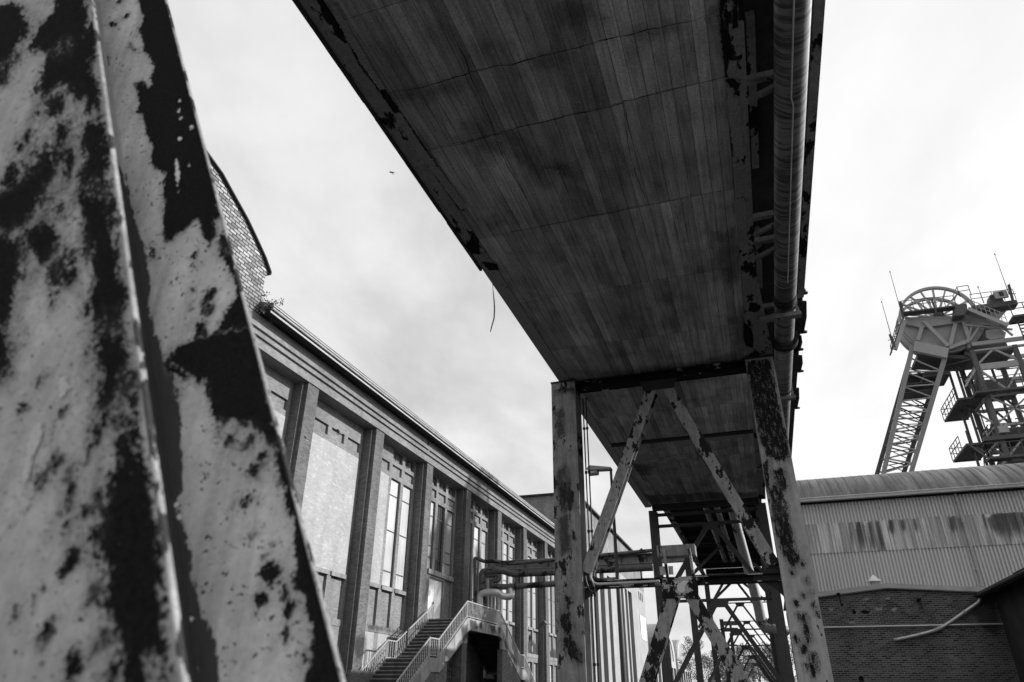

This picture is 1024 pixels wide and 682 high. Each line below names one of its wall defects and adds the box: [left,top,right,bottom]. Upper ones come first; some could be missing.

peeling [117,159,220,682]
peeling [22,423,43,484]
leakage [849,520,917,546]
leakage [983,512,1024,534]